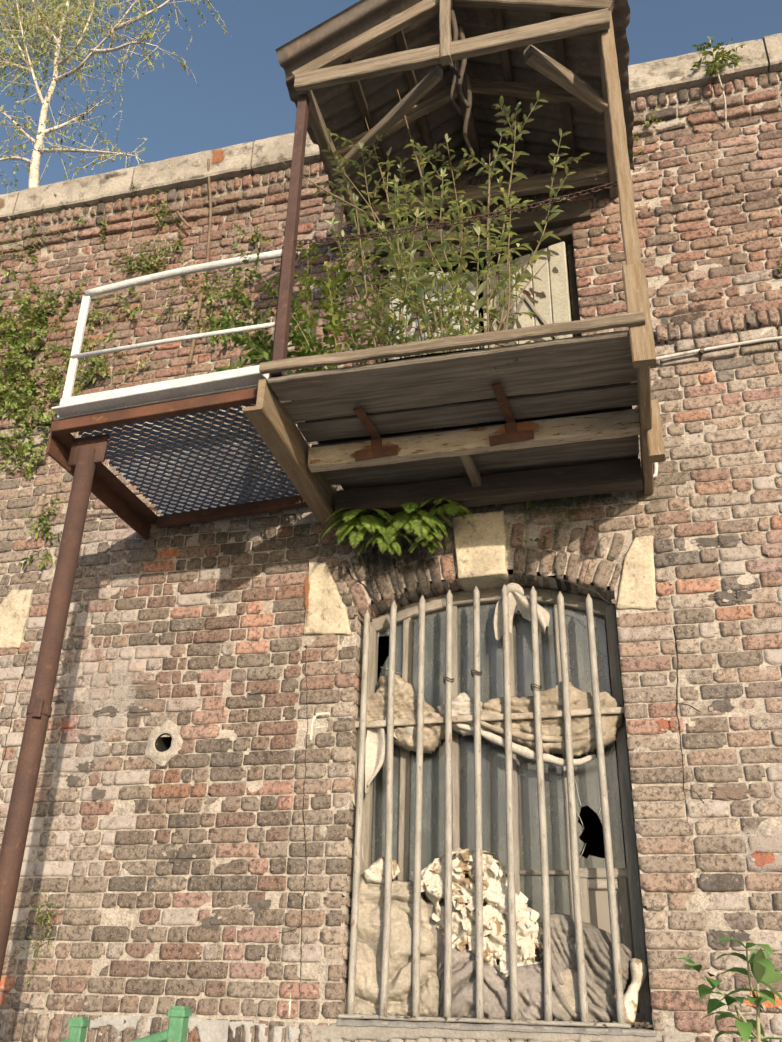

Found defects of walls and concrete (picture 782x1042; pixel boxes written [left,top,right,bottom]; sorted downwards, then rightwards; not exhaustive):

crack [673,629,705,825]
peeling [73,999,152,1040]
peeling [188,1017,300,1042]